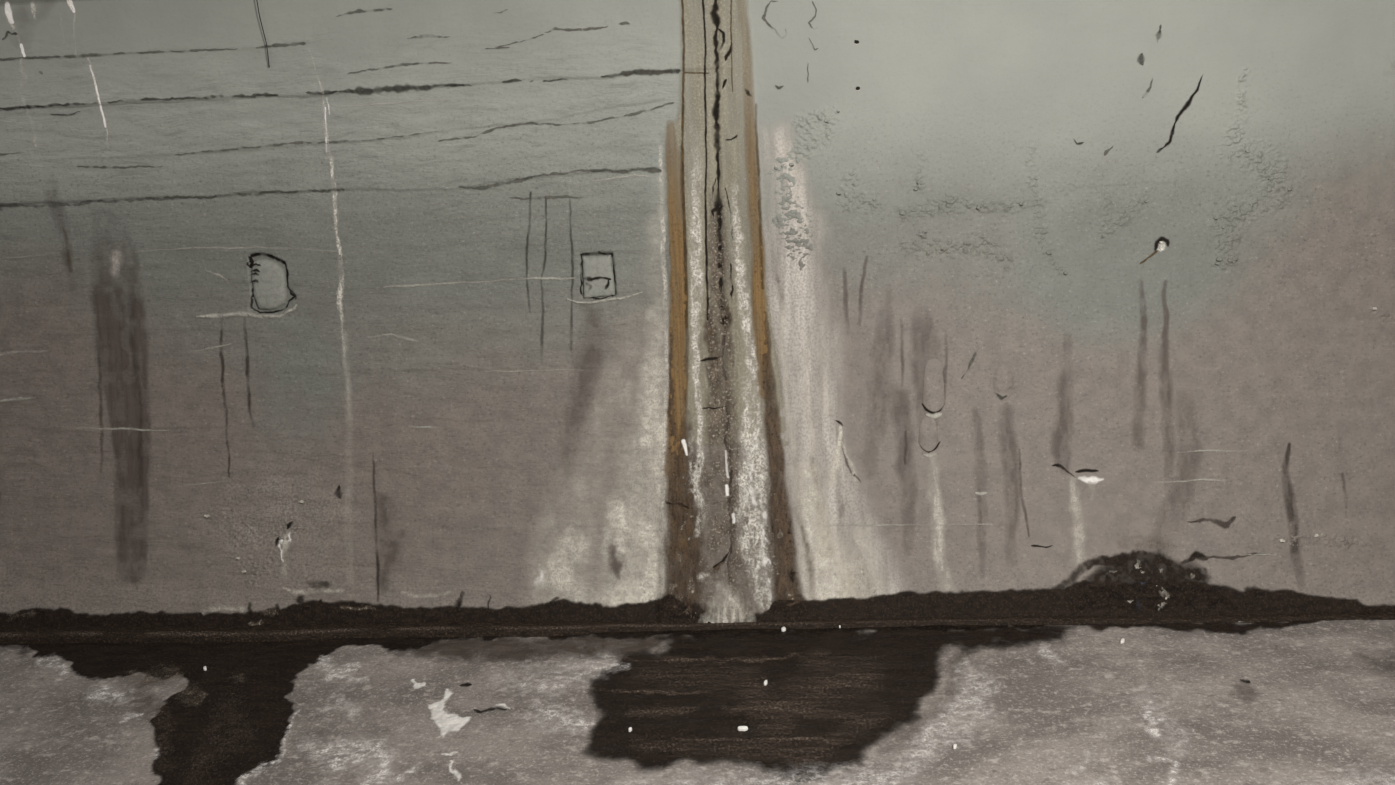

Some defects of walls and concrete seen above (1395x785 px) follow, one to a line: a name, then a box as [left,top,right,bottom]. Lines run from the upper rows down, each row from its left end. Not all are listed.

crack [336,8,392,17]
crack [0,36,465,115]
crack [1157,75,1203,152]
crack [0,141,345,207]
spalling [247,253,295,313]
crack [378,0,750,586]
rust [665,172,700,613]
damp [0,128,1395,634]
rust [748,138,802,606]
damp [22,625,1070,785]
damp [1143,701,1167,736]